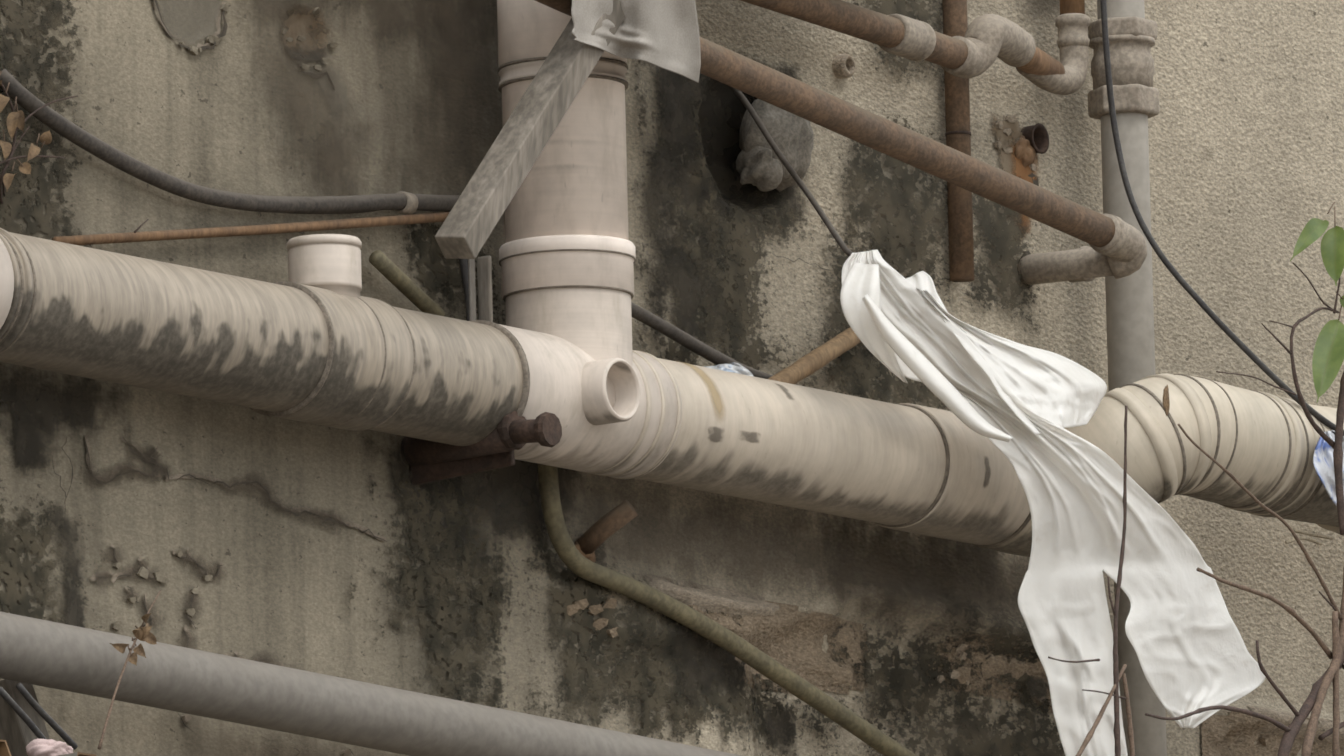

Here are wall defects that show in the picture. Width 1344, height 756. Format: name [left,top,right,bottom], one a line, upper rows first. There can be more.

damp [0,0,86,121]
peeling [153,0,231,56]
damp [0,90,92,248]
damp [0,481,105,630]
crack [52,435,387,542]
damp [348,446,840,756]
damp [595,496,1065,756]